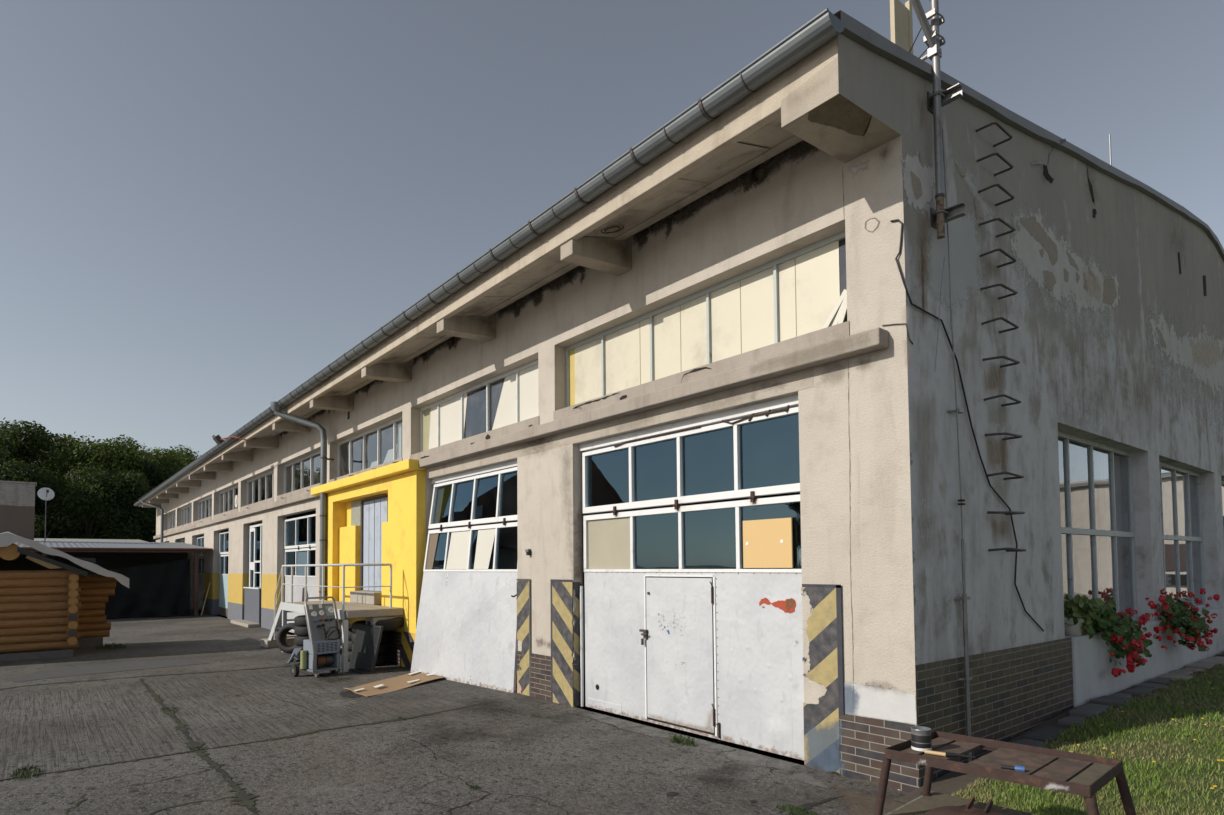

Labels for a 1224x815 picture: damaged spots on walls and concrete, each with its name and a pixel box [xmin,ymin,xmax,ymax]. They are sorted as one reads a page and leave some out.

leakage [622,141,817,256]
peeling [900,151,935,215]
spalling [1032,160,1054,183]
leakage [497,266,585,317]
peeling [1010,208,1120,341]
leakage [413,336,461,366]
peeling [1148,306,1224,430]